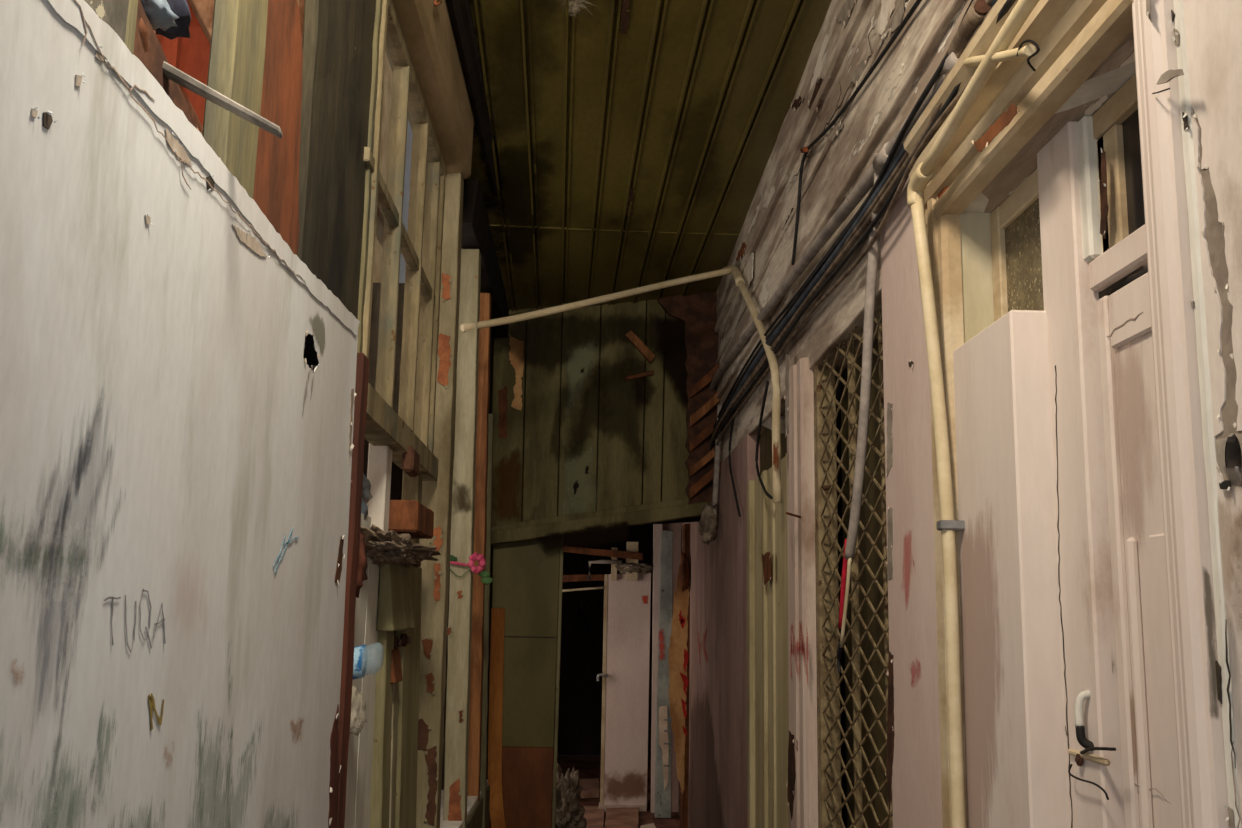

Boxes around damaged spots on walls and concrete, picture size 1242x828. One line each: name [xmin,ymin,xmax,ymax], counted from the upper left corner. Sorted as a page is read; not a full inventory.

crack [74,0,306,284]
spalling [303,331,320,373]
water stain [566,340,596,409]
water stain [562,450,593,514]